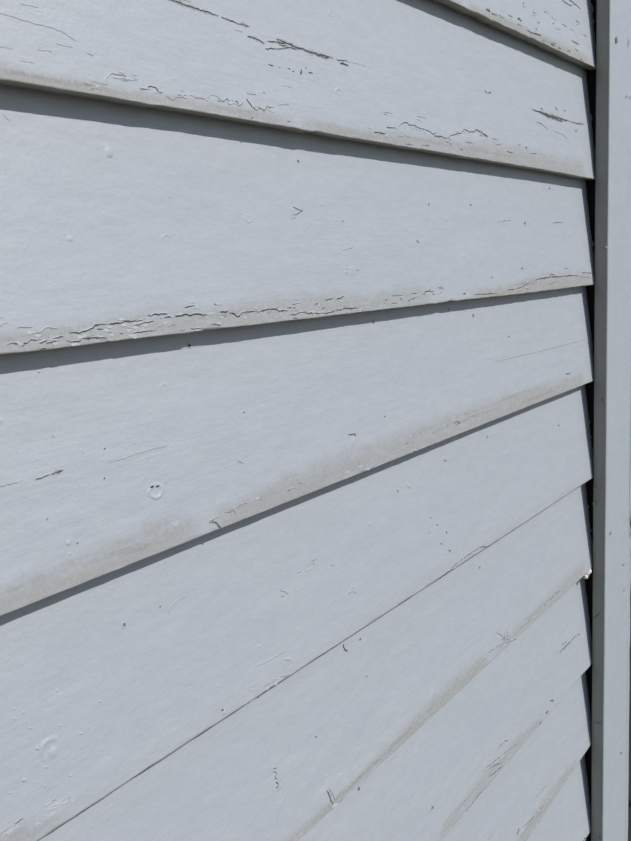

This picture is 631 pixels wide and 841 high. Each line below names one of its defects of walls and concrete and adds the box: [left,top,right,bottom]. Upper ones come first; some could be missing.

peeling [84,71,273,119]
peeling [368,115,501,151]
peeling [7,295,362,349]